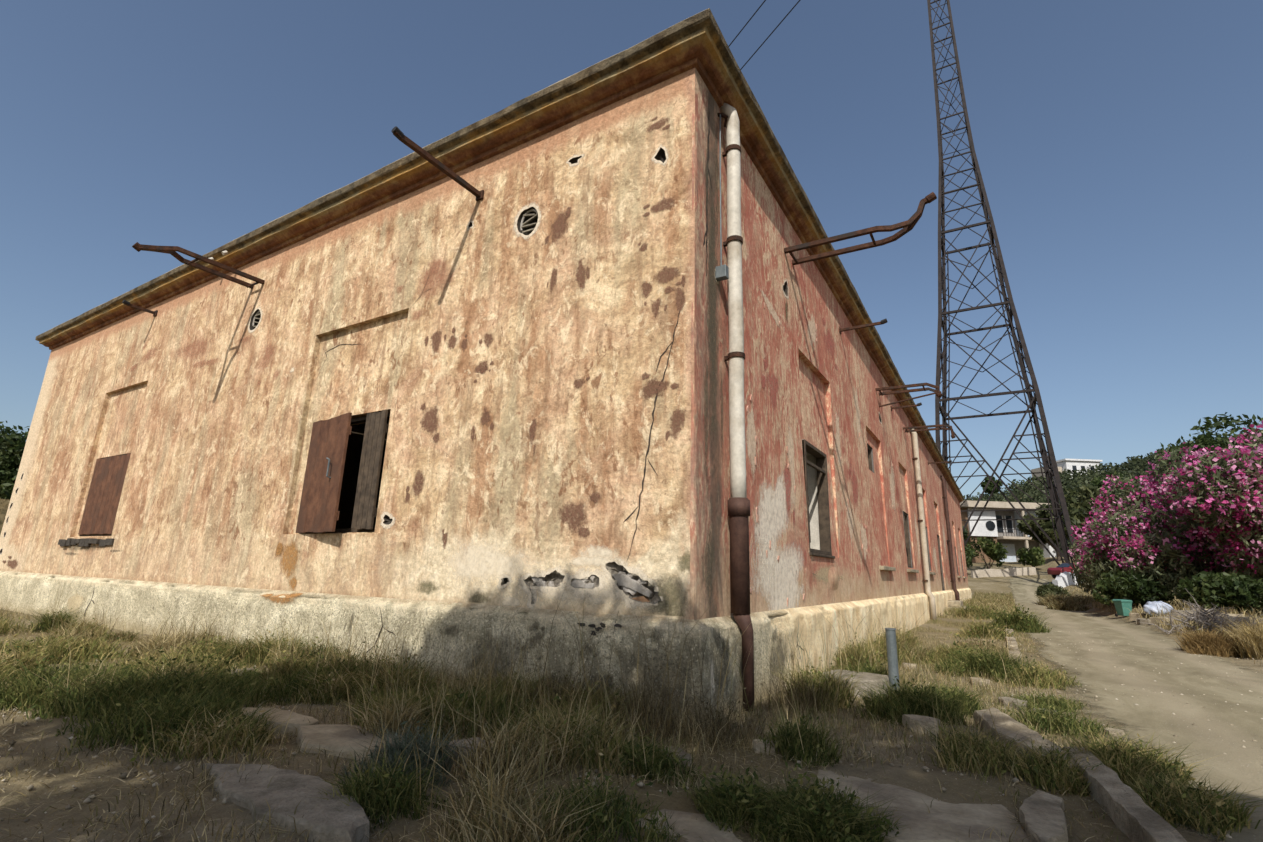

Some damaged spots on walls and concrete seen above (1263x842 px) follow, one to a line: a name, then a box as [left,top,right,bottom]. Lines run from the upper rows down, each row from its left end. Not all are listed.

flaking render [651,144,668,165]
damp [425,328,494,383]
damp [642,373,679,399]
damp [420,403,439,443]
damp [471,409,494,440]
crack [624,311,680,560]
damp [666,409,685,441]
damp [405,472,424,502]
peeling [746,394,807,611]
damp [679,533,714,595]
flaking render [497,557,668,612]
peeling [577,622,622,657]